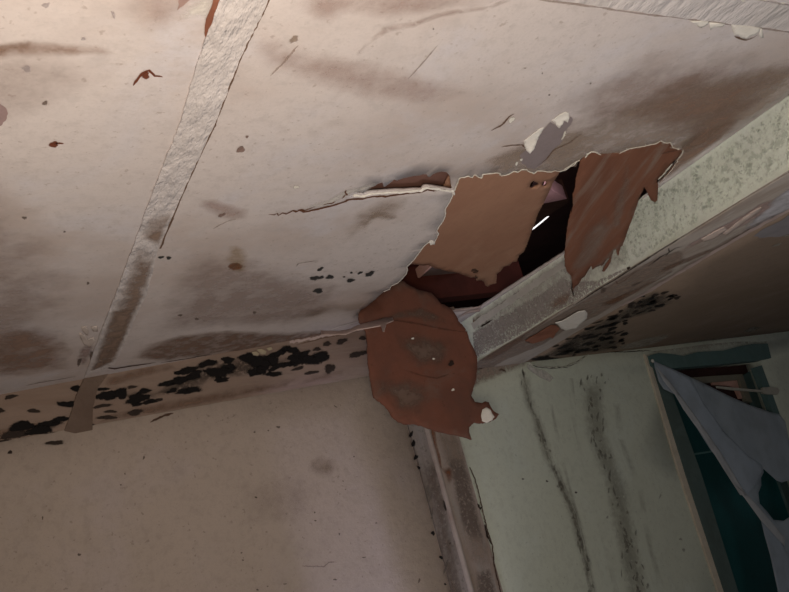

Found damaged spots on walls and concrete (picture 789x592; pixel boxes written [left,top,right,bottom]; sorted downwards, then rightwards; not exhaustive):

peeling [177,0,219,37]
corrosion [133,69,162,86]
peeling [0,104,8,126]
peeling [504,112,580,169]
damp [525,69,789,175]
crack [269,186,455,216]
peeling [604,203,789,306]
peeling [485,310,587,360]
damp [473,252,683,384]
damp [93,333,347,425]
damp [0,385,80,454]
peeling [481,407,494,423]